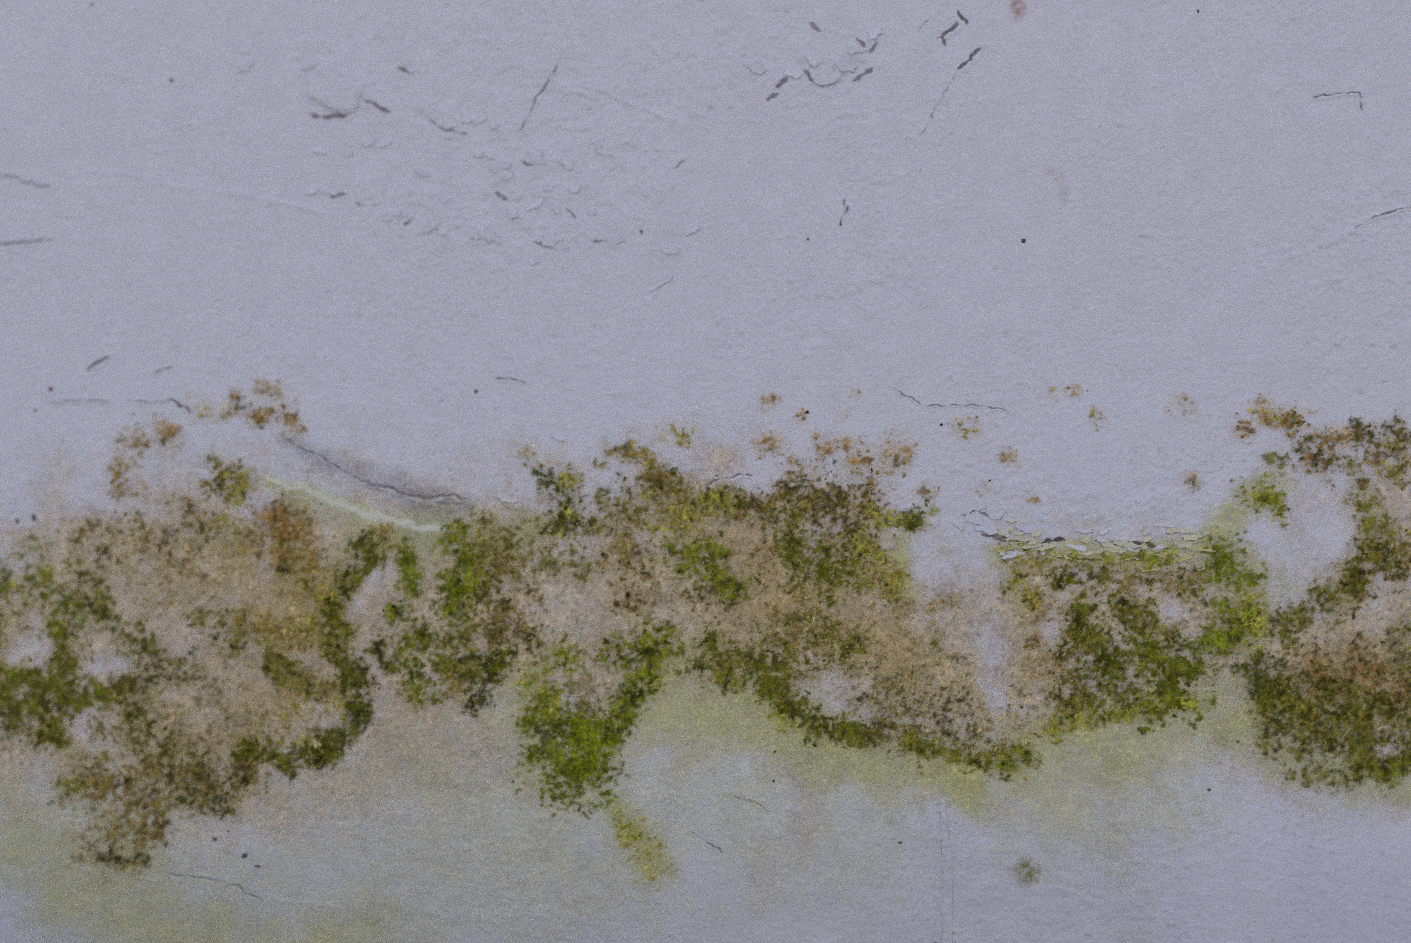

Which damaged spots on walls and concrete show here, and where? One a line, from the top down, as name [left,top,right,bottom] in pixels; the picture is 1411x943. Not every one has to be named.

damp [0,379,1411,835]
peeling [952,503,1216,572]